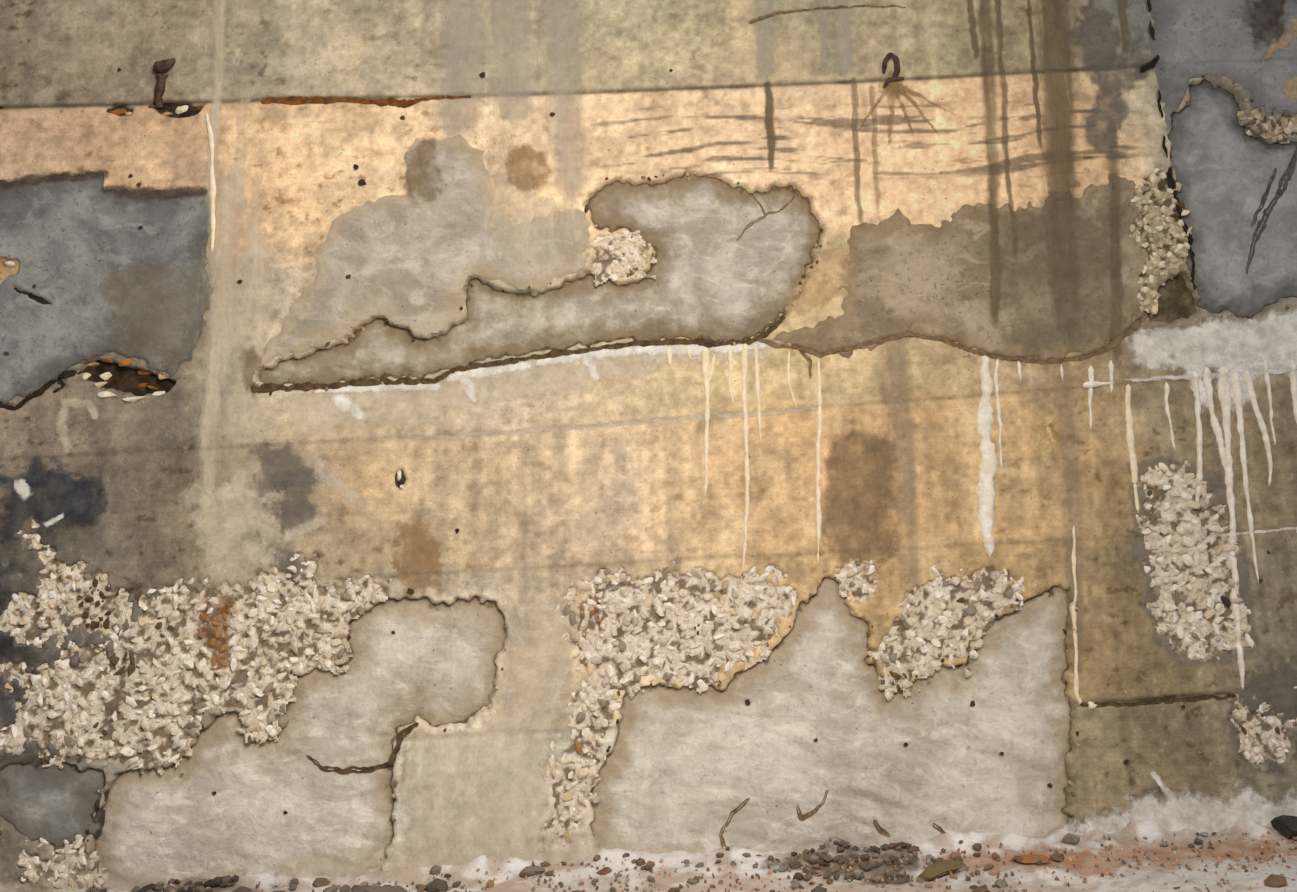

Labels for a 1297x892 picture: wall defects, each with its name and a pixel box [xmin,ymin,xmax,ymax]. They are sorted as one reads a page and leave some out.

peeling [0,171,213,405]
spalling [0,518,393,776]
crack [306,723,419,775]
water stain [0,0,895,587]
peeling [258,135,657,368]
spalling [539,554,798,854]
peeling [773,163,1192,364]
water stain [976,355,1002,557]
water stain [967,0,1018,317]
water stain [1028,0,1297,772]
water stain [1064,771,1297,834]
spalling [1136,460,1254,660]